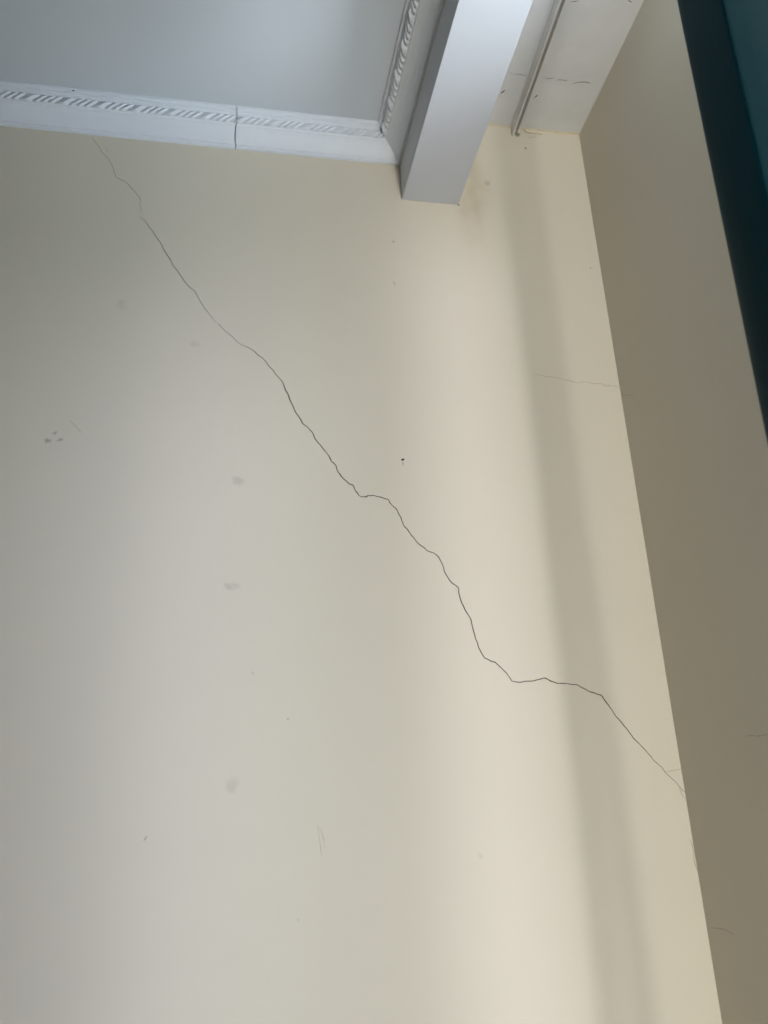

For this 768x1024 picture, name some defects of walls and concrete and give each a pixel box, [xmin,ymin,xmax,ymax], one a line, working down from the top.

crack [93,139,685,798]